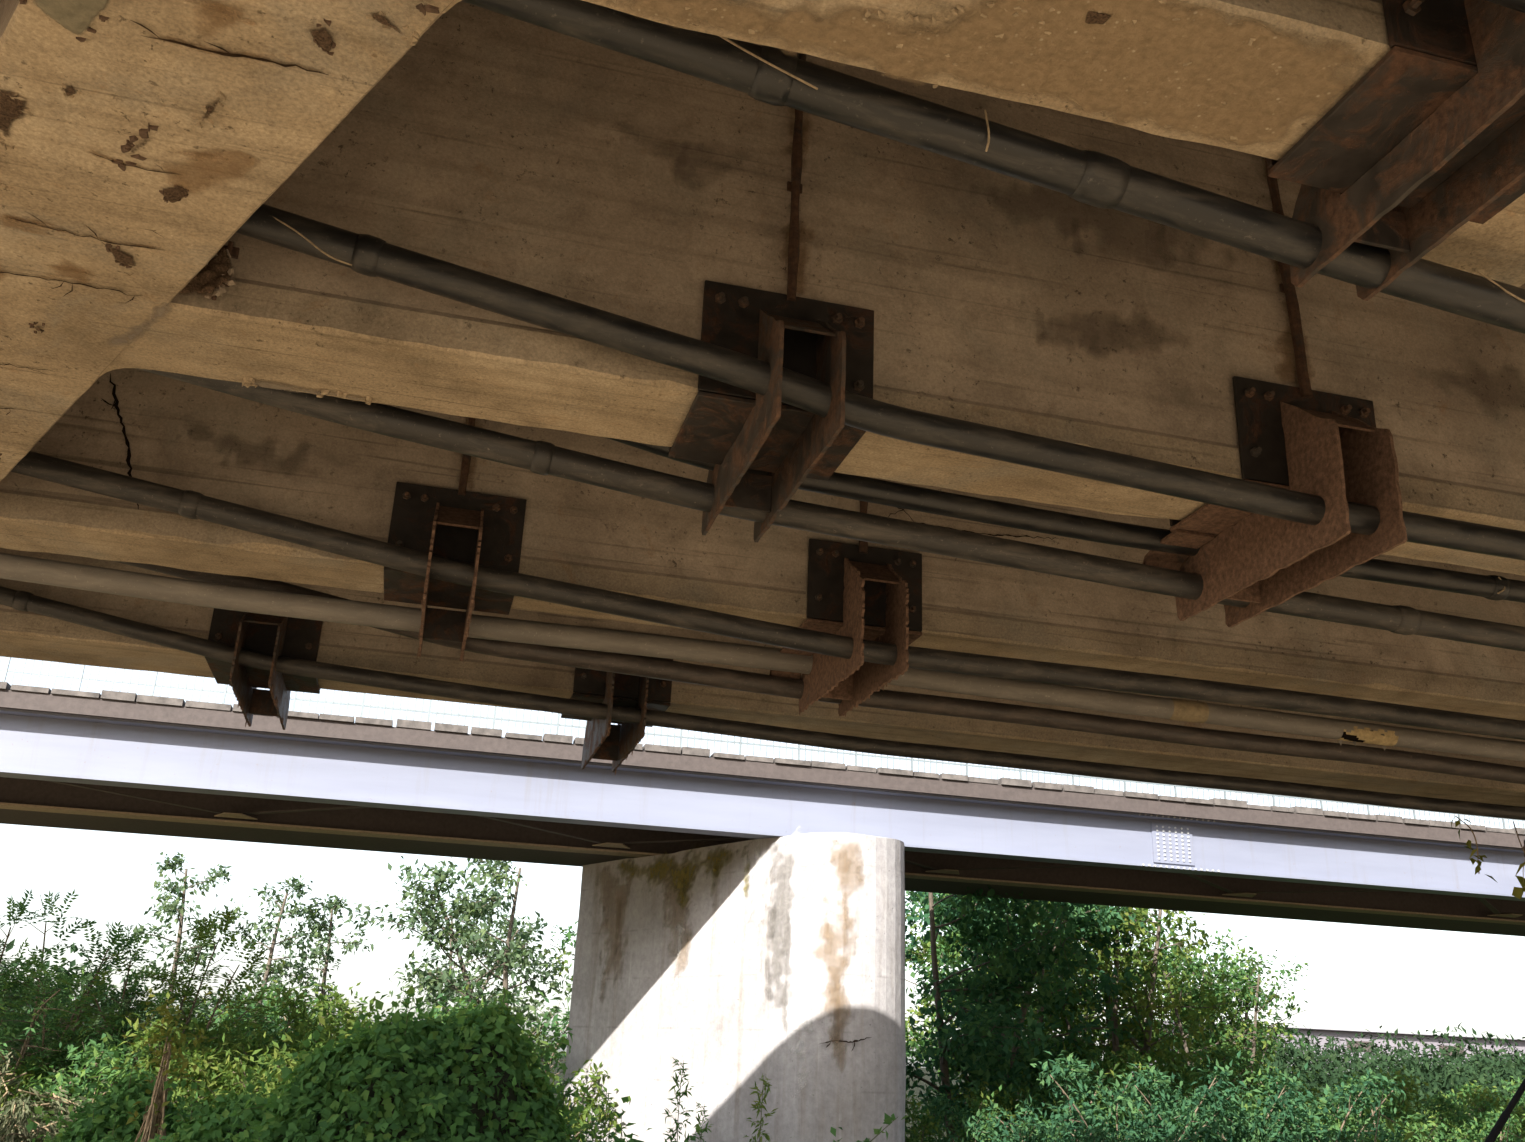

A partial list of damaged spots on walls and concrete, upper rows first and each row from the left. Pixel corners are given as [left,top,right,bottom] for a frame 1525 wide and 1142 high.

spalling [311,19,336,56]
spalling [0,90,33,150]
spalling [105,243,135,268]
corrosion [786,109,808,302]
corrosion [1260,156,1284,215]
corrosion [1275,260,1313,398]
crack [101,373,139,509]
damp [743,846,791,1026]